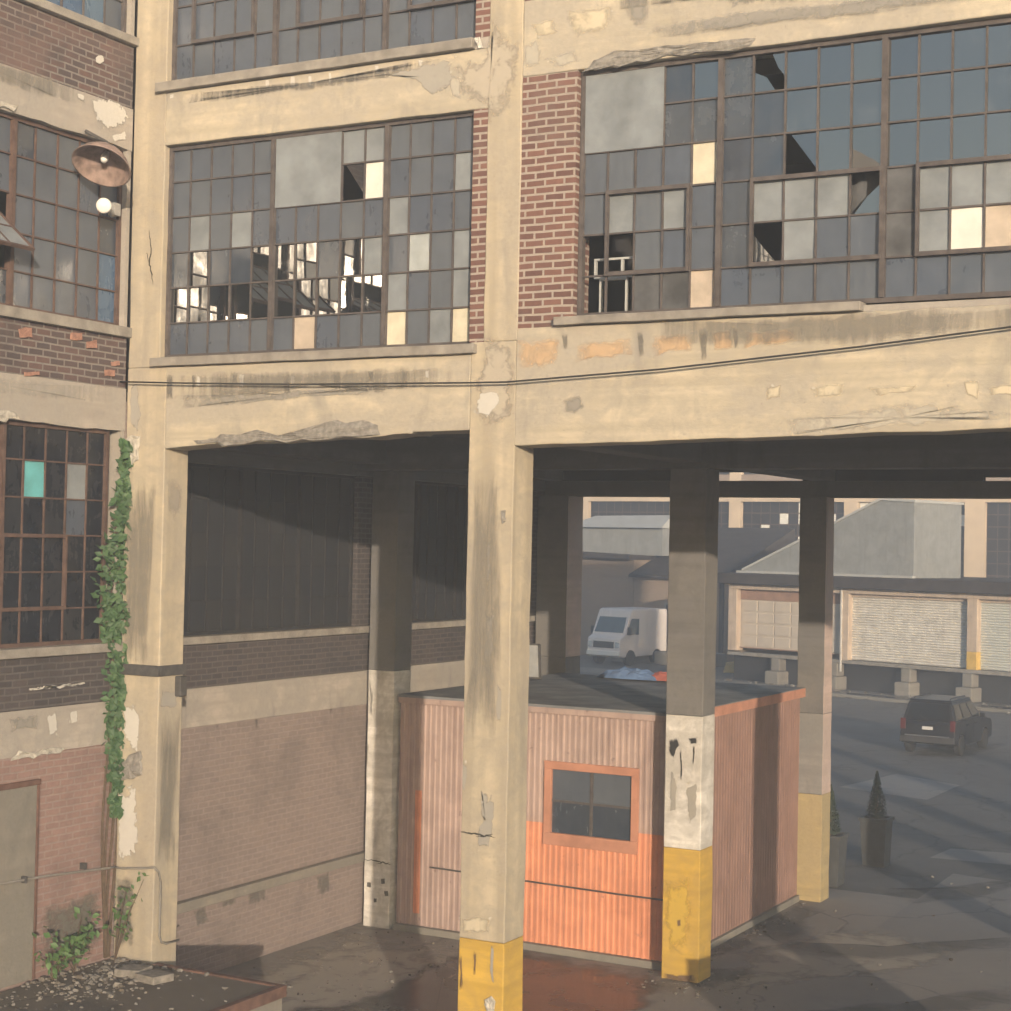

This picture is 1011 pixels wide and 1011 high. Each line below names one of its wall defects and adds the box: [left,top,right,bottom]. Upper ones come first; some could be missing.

leakage [675,0,935,33]
peeling [382,56,460,97]
peeling [78,93,129,142]
crack [145,234,153,281]
spalling [18,327,33,338]
spalling [70,332,97,348]
spalling [104,361,120,377]
peeling [473,392,499,417]
spalling [11,713,65,761]
peeling [118,705,143,860]
peeling [478,791,494,846]
peeling [670,772,697,820]